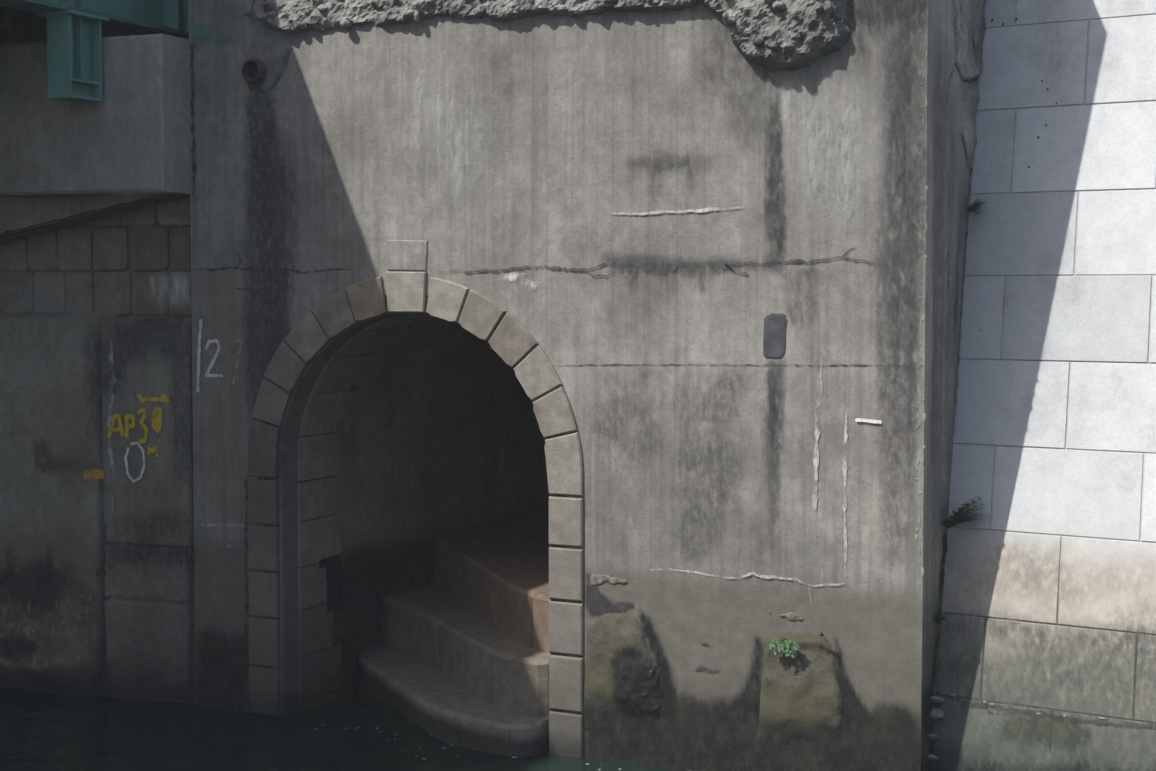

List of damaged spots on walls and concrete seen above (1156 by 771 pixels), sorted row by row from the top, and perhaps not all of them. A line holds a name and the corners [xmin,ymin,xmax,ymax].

spalling [242,0,852,73]
spalling [953,0,1017,170]
water stain [246,95,295,480]
crack [437,248,886,277]
water stain [606,99,786,273]
water stain [846,0,960,469]
crack [651,568,844,594]
water stain [586,694,925,771]